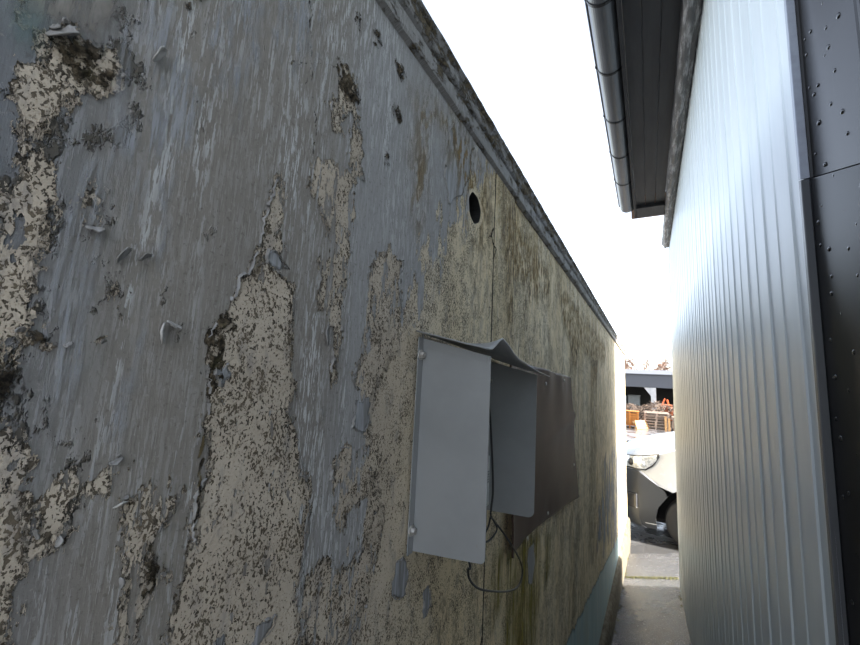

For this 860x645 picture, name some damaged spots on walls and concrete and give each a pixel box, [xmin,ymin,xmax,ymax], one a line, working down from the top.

peeling [0,17,127,374]
peeling [0,172,385,645]
peeling [306,57,366,389]
peeling [351,242,405,398]